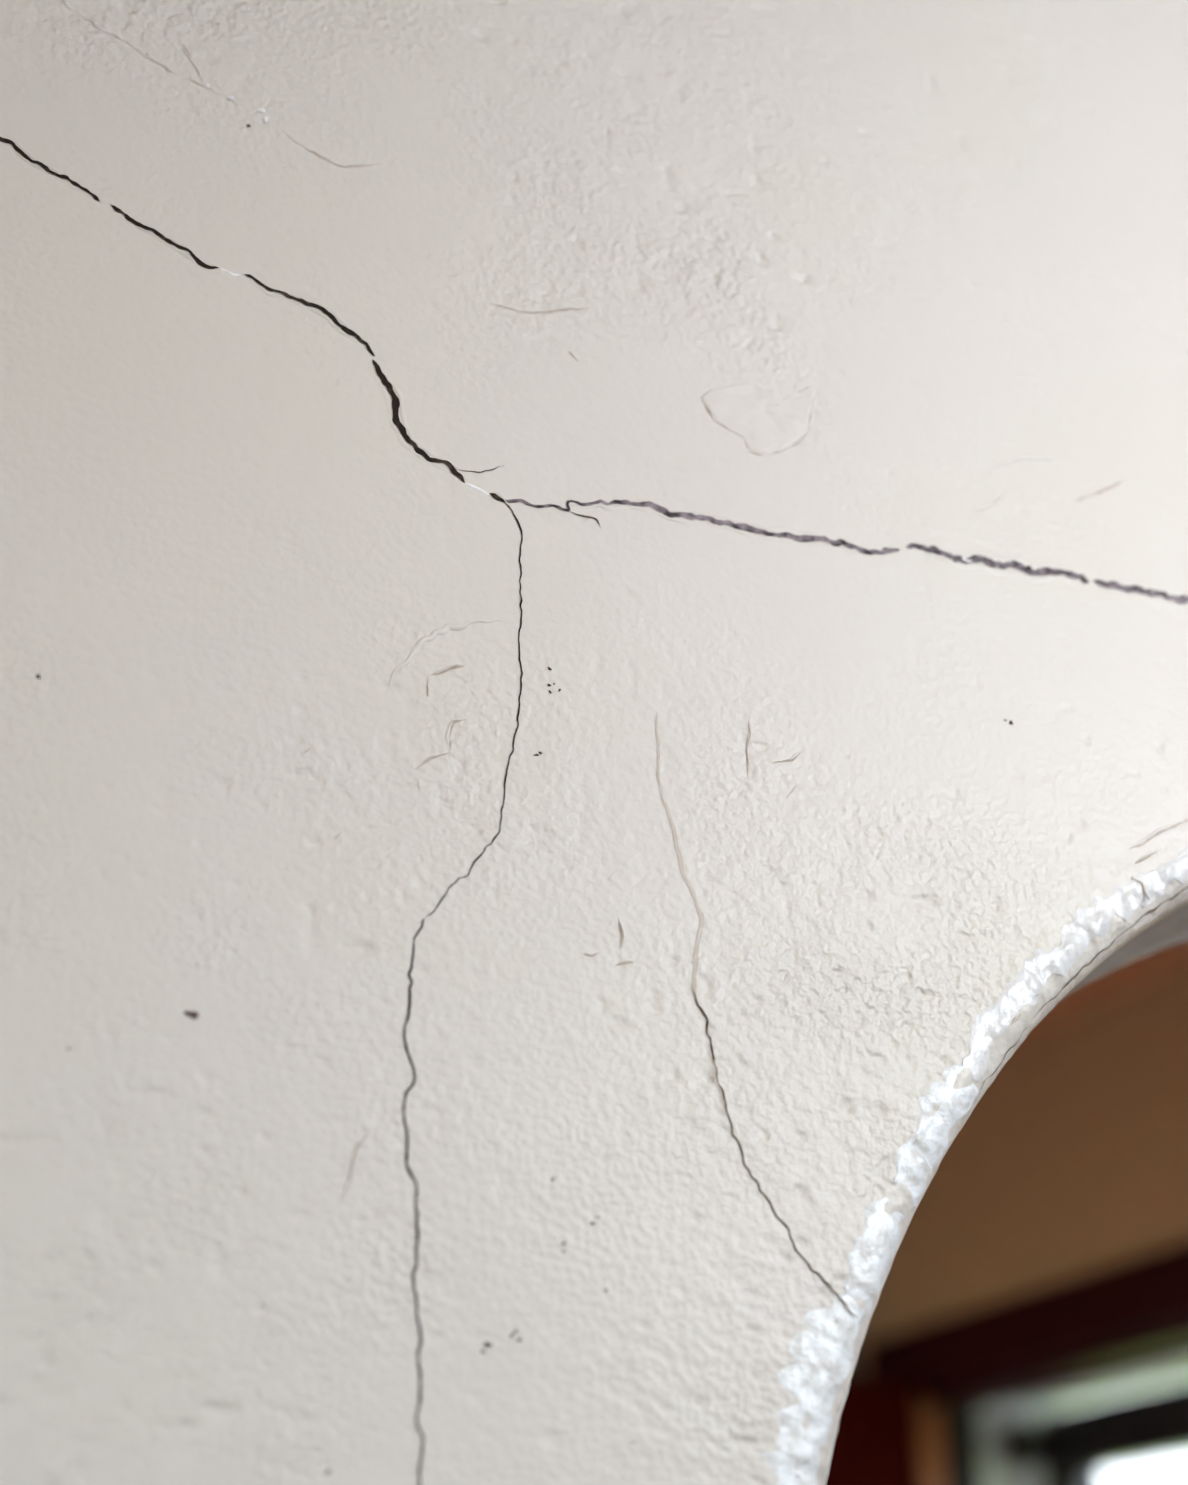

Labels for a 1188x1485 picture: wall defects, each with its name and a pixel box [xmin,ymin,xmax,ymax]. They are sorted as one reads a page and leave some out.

crack [0,135,99,201]
crack [111,205,1188,1485]
peeling [761,846,1188,1485]